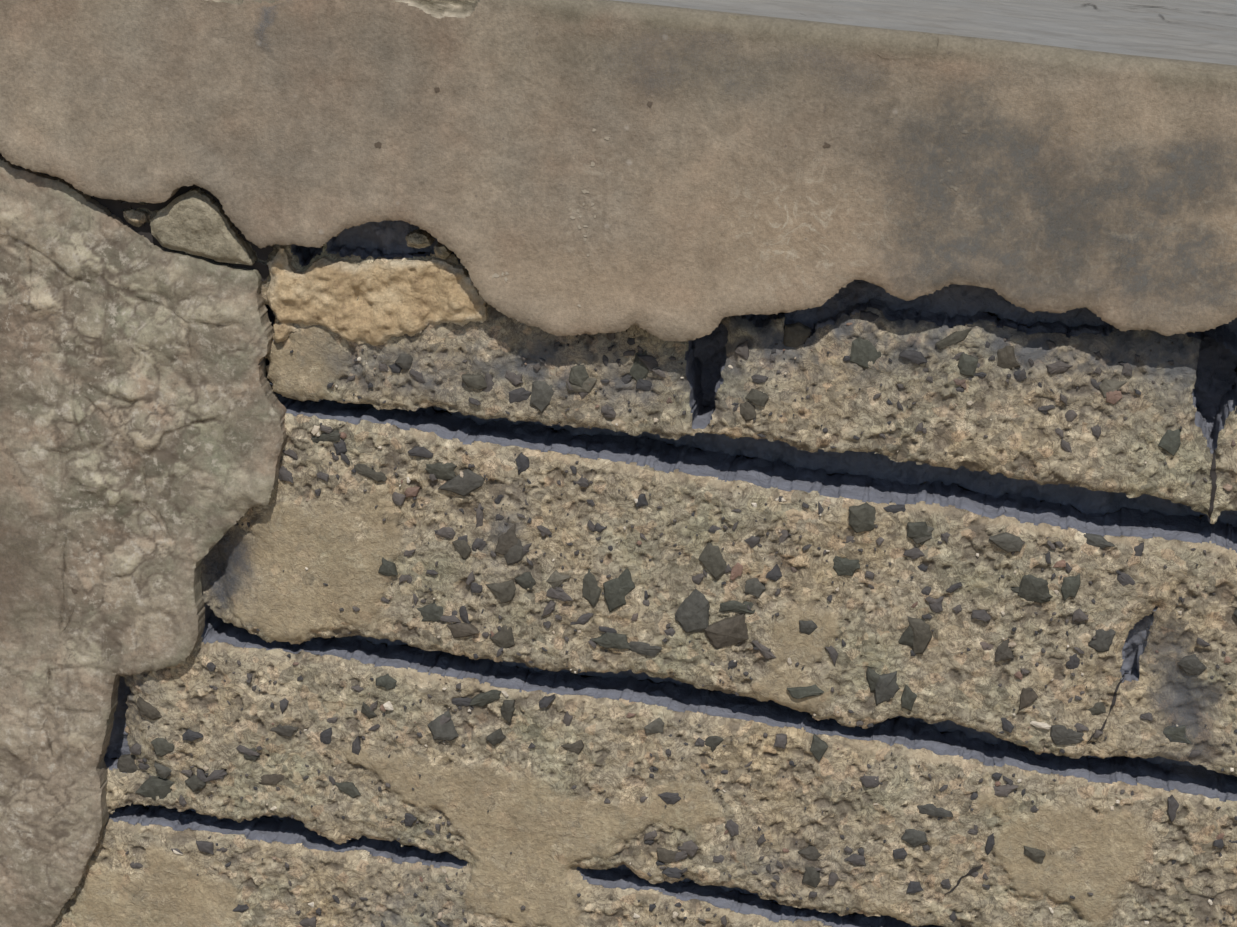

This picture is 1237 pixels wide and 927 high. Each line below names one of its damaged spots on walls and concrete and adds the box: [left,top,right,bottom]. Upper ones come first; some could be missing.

spalling [394,0,480,19]
water stain [896,102,1234,304]
crack [1208,449,1217,519]
spalling [51,188,1237,927]
crack [1087,675,1125,743]